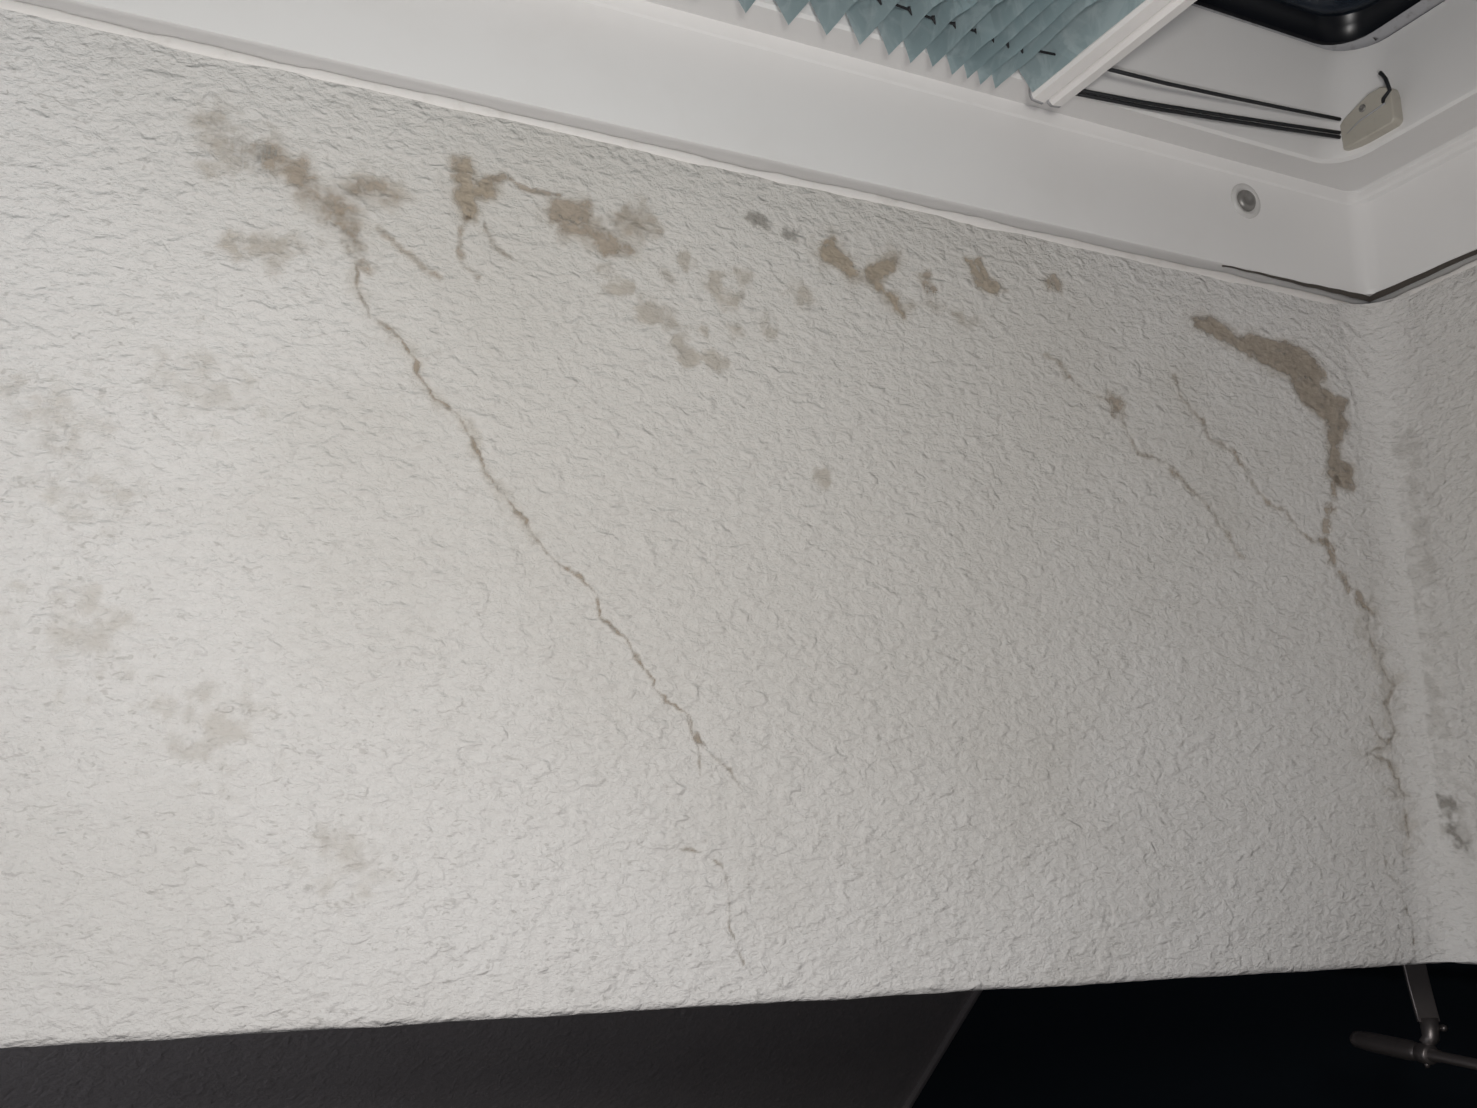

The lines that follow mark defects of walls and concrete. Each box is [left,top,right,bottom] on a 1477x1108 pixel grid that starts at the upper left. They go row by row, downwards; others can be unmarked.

leakage [454,159,633,256]
leakage [820,239,904,314]
leakage [965,258,1000,293]
crack [388,328,450,407]
leakage [1192,317,1370,610]
crack [565,567,702,743]